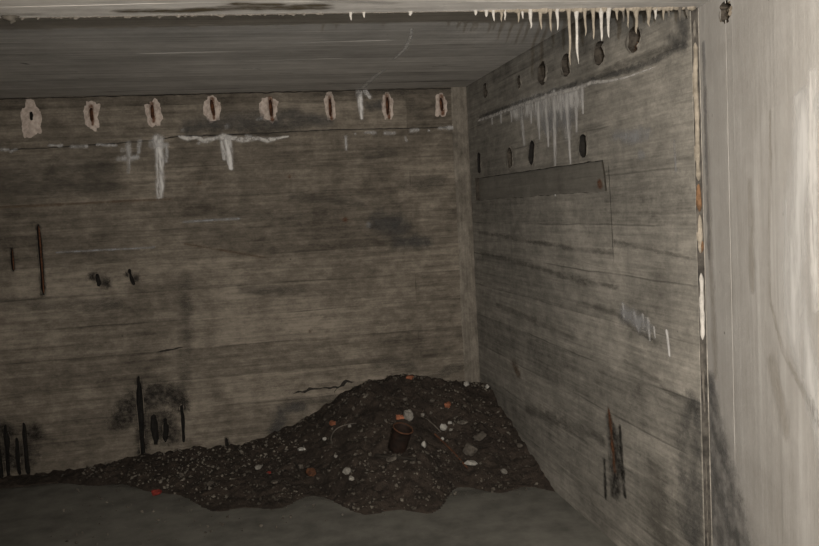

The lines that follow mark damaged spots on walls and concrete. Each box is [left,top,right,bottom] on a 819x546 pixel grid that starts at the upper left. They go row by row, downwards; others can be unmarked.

water stain [479,6,696,14]
water stain [478,58,659,164]
efflorescence [154,136,167,196]
water stain [179,117,289,170]
crack [293,380,353,394]
corrosion [603,409,626,498]